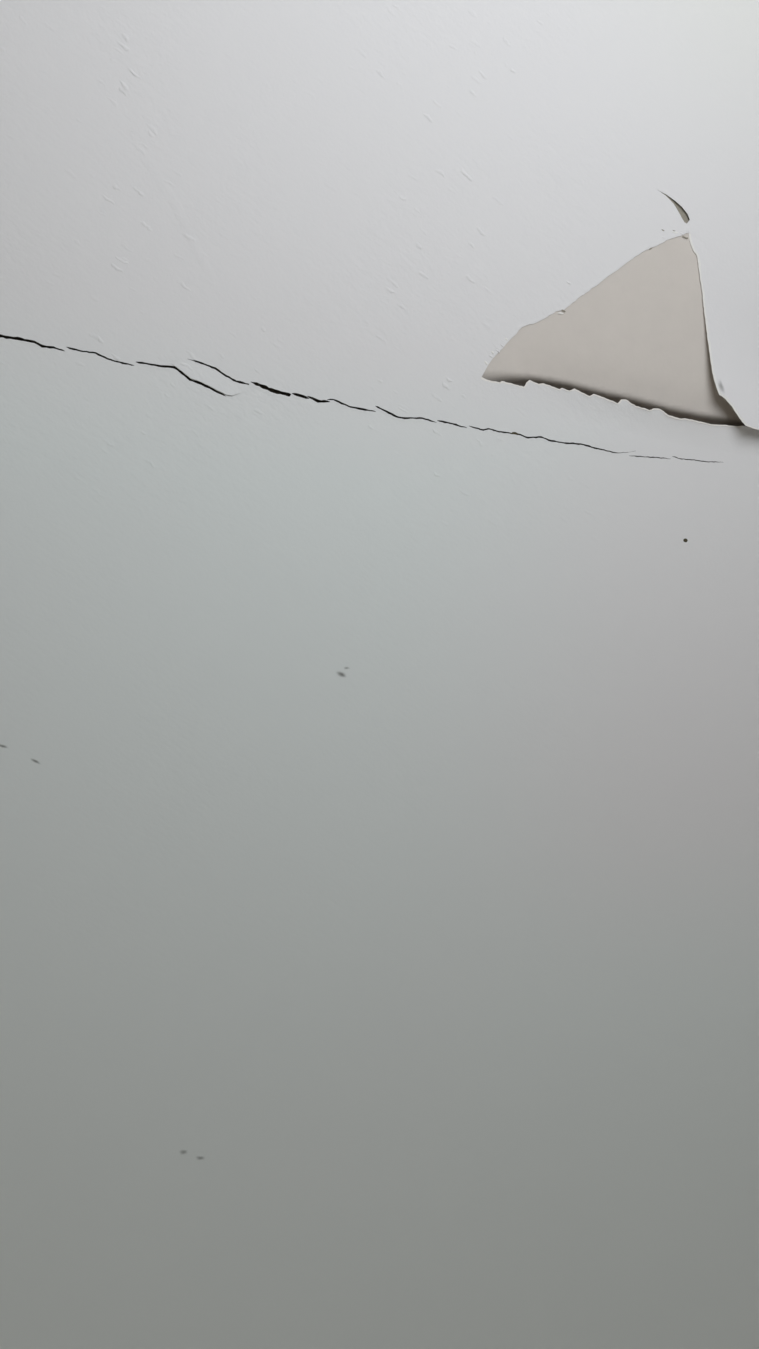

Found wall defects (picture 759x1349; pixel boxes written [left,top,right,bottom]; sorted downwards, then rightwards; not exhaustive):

crack [0,334,716,462]
peeling [463,225,759,456]